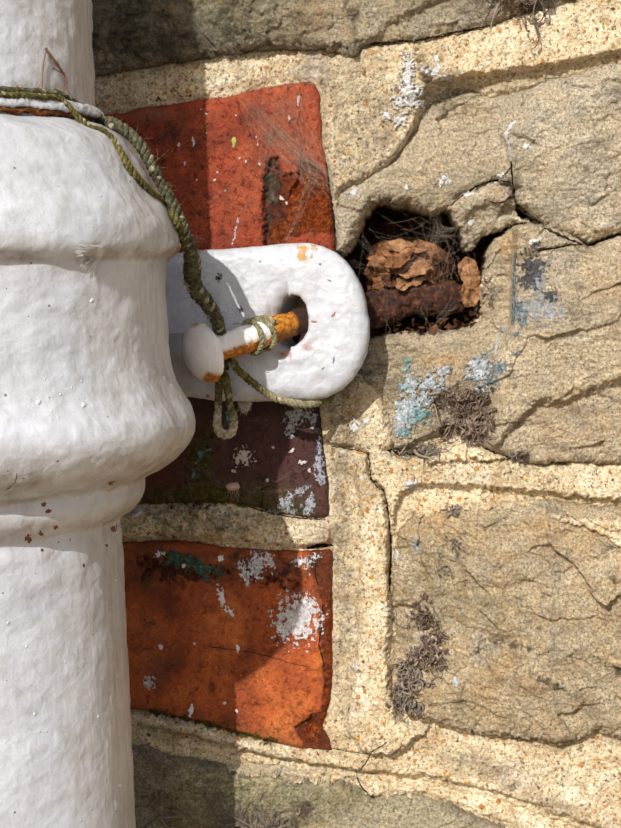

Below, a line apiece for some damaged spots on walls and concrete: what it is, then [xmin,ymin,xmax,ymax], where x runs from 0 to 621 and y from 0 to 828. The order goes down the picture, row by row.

crack [450,138,620,251]